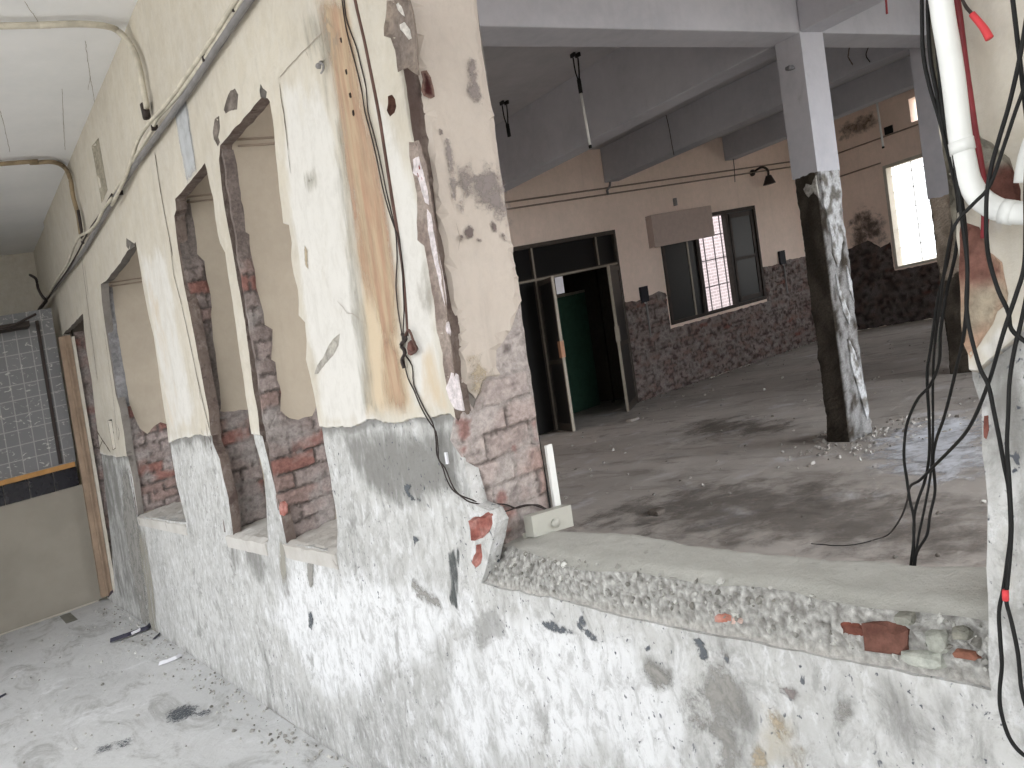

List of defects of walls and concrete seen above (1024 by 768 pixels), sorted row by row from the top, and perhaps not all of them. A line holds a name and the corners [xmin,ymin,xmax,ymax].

corrosion [324,4,405,407]
flaking render [384,0,435,99]
peeling [439,129,457,198]
peeling [468,59,481,102]
damp [842,114,875,134]
flaking render [108,285,180,512]
flaking render [180,89,336,537]
peeling [314,334,340,374]
flaking render [409,140,549,567]
flaking render [803,170,942,420]
peeling [694,638,708,660]